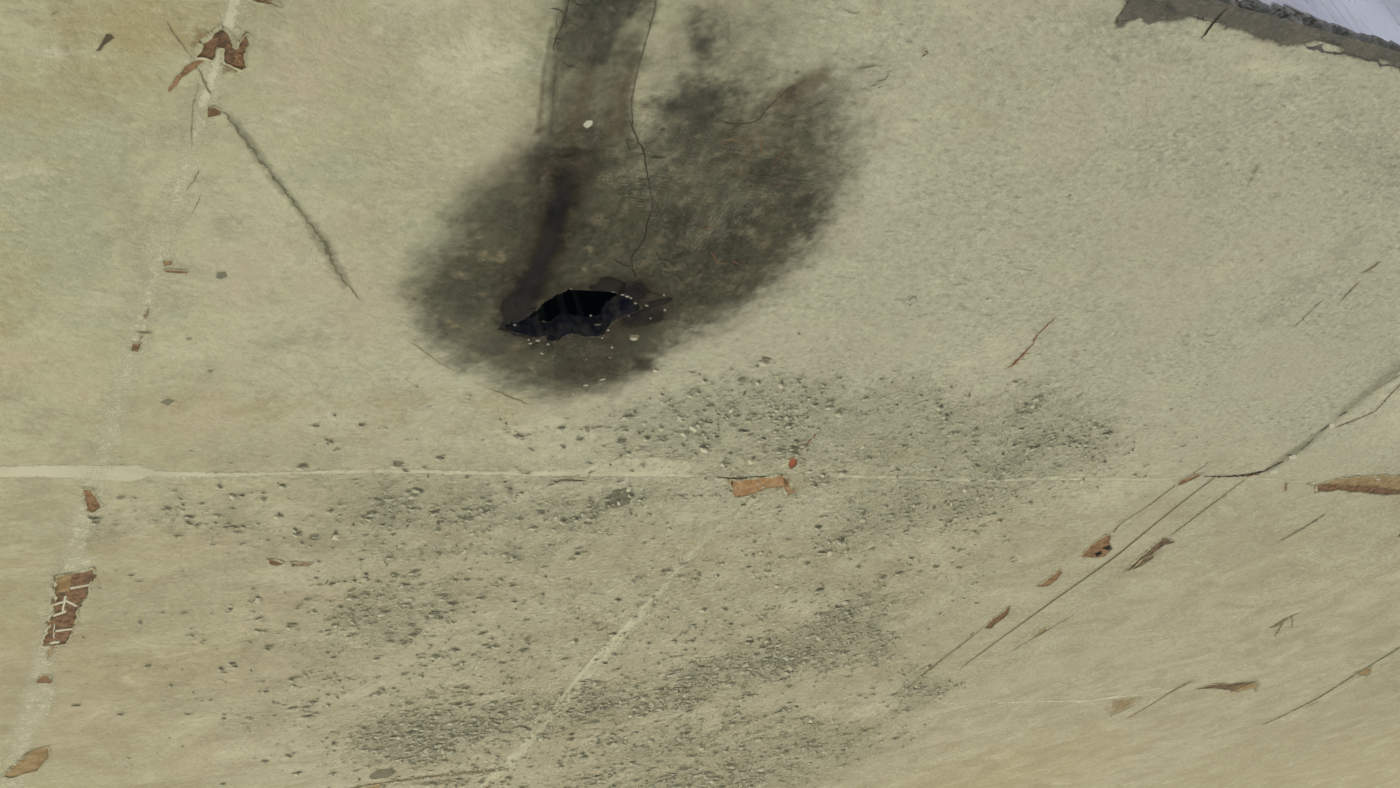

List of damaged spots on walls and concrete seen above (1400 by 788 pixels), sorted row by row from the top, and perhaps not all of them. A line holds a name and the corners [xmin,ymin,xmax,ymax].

corrosion [168,25,253,91]
leakage [1116,0,1400,69]
spalling [1217,0,1400,69]
crack [164,17,359,299]
leakage [417,0,823,391]
spalling [504,291,667,375]
corrosion [1309,474,1400,495]
spalling [88,339,1206,788]
crack [903,461,1264,692]
corrosion [34,567,97,684]
crack [1263,648,1400,725]
corrosion [1,745,51,779]